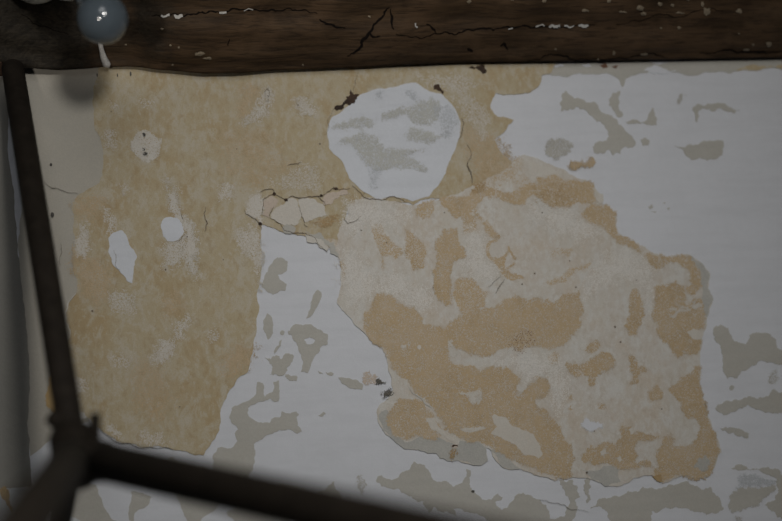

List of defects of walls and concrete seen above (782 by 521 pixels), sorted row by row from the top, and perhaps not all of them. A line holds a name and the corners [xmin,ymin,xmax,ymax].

crack [153,8,345,28]
crack [347,7,593,57]
crack [244,186,404,252]
flaking render [65,58,782,503]
flaking render [179,501,215,521]
flaking render [591,481,724,521]
flaking render [728,464,782,521]